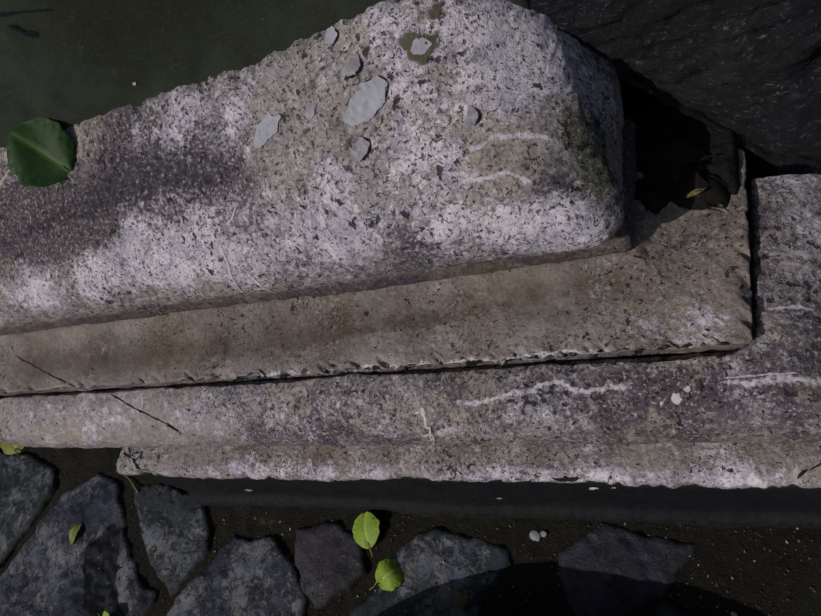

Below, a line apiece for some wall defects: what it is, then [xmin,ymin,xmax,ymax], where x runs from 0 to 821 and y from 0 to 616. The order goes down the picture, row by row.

spalling [428,2,443,20]
peeling [324,26,339,46]
peeling [410,38,432,55]
peeling [338,54,389,126]
peeling [464,106,482,126]
peeling [253,114,282,148]
peeling [351,137,371,162]
crack [0,170,11,190]
crack [15,355,72,388]
leakage [720,372,821,388]
leakage [456,379,633,407]
crack [110,394,186,436]